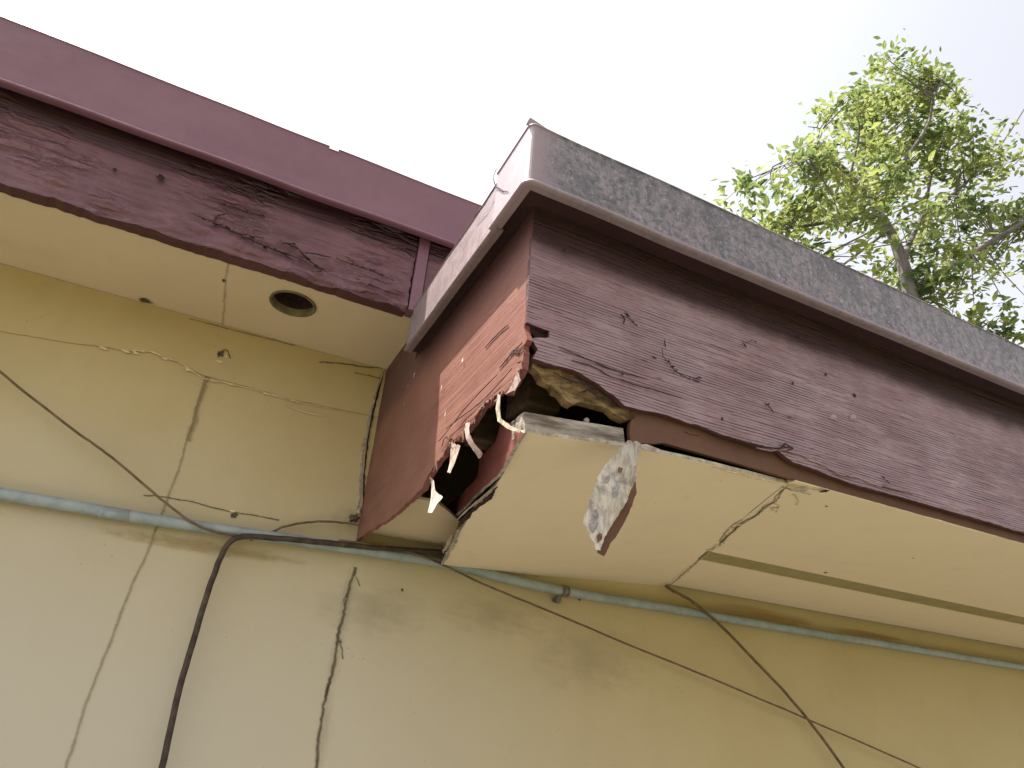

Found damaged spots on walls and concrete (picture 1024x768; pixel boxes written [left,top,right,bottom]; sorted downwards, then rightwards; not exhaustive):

crack [190,203,394,293]
crack [320,361,381,379]
peeling [496,369,521,433]
peeling [559,347,683,399]
peeling [428,477,443,513]
peeling [447,422,483,473]
peeling [583,440,661,556]
peeling [703,429,913,495]
crack [668,485,789,586]
crack [315,567,360,768]